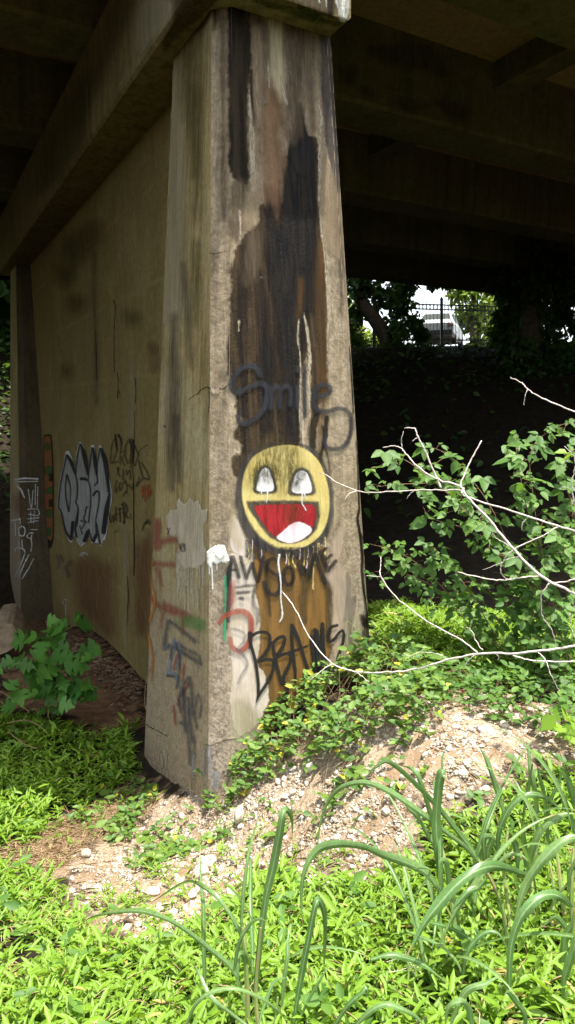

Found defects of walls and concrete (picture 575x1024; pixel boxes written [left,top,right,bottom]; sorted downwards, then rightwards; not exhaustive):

crack [190,385,228,413]
water stain [221,18,344,476]